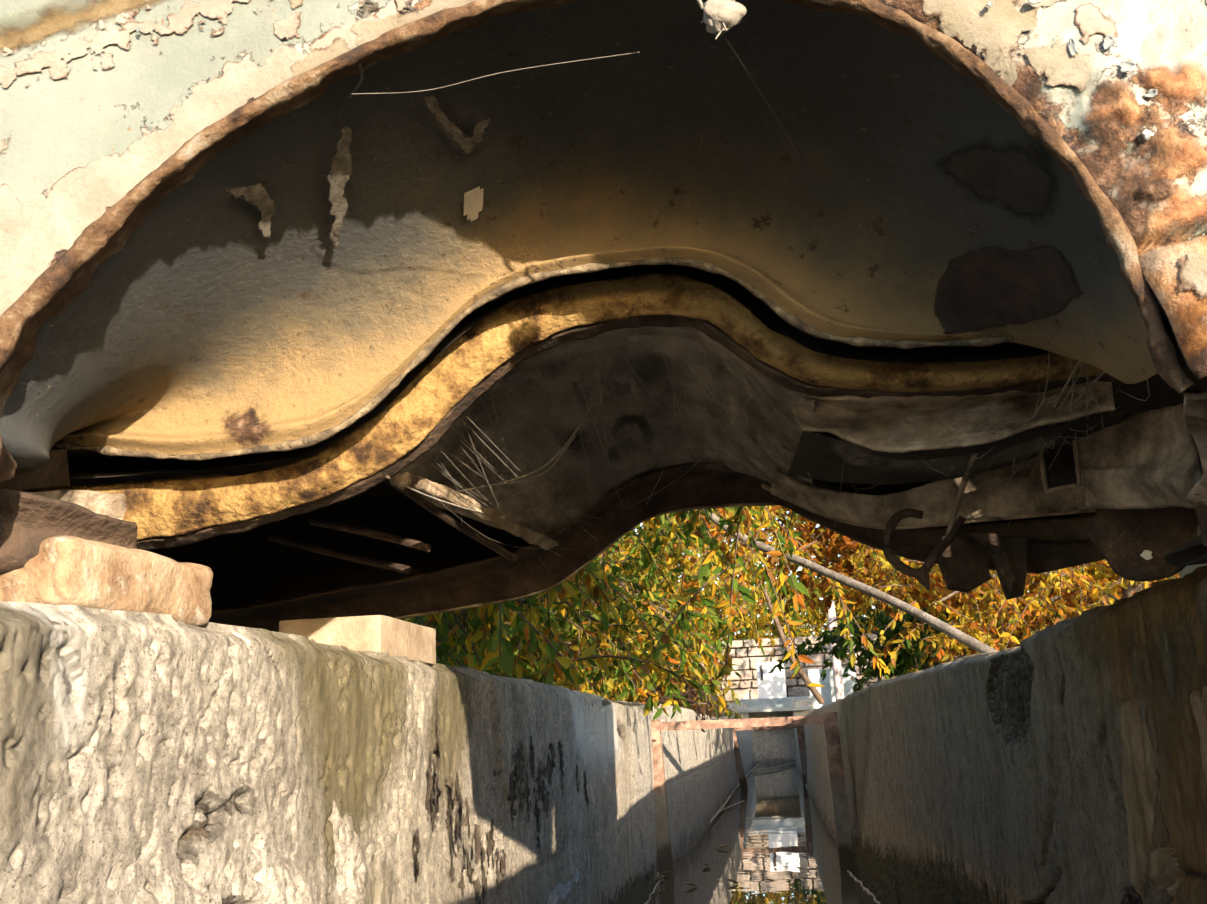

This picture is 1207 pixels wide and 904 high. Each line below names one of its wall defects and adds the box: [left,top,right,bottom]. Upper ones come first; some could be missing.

leakage [430,664,469,785]
leakage [572,694,621,769]
spalling [986,645,1034,746]
spalling [176,785,256,865]